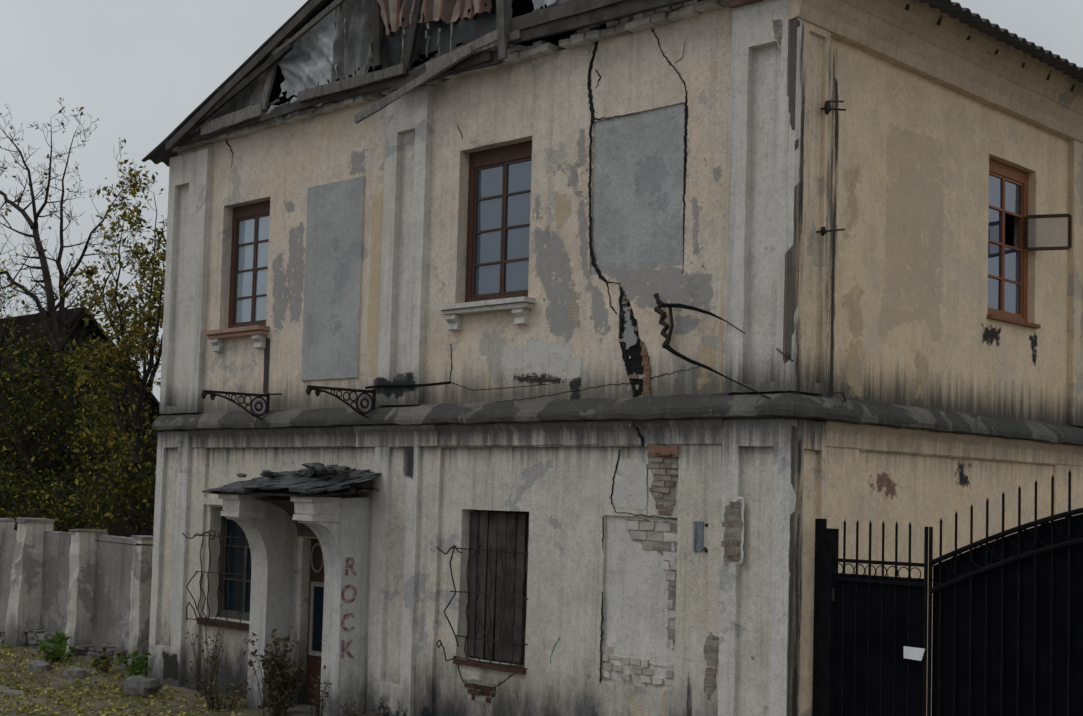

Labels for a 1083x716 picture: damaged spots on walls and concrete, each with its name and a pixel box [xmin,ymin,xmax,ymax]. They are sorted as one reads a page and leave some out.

peeling [271,197,305,329]
crack [497,28,700,548]
peeling [500,128,715,397]
water stain [1029,333,1037,365]
spalling [612,446,679,649]
spalling [721,496,744,566]
crack [597,590,605,683]
flaking render [601,645,674,690]
spalling [702,632,719,700]